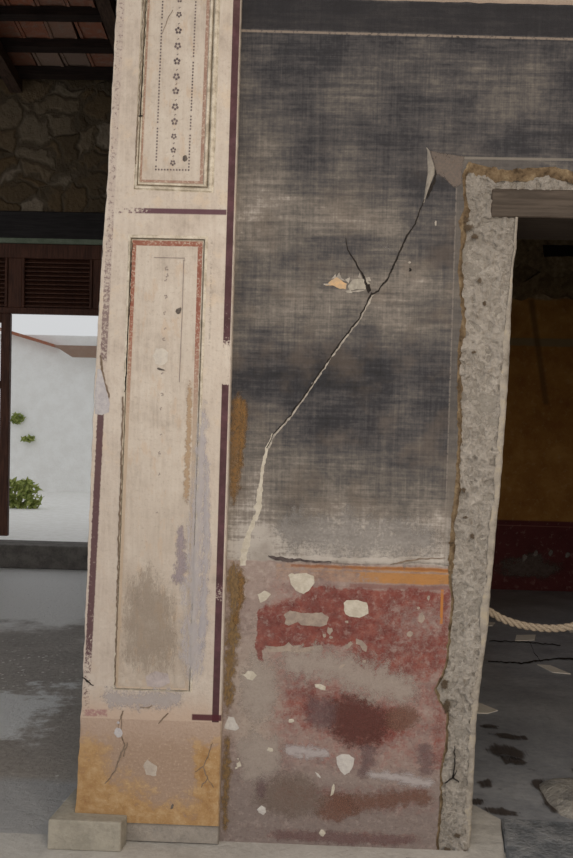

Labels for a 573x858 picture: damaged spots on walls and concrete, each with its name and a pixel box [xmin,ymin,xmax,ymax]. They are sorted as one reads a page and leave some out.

peeling [423,147,437,203]
crack [239,182,433,566]
flaking render [266,162,573,851]
crack [105,705,169,784]
crack [445,746,459,784]